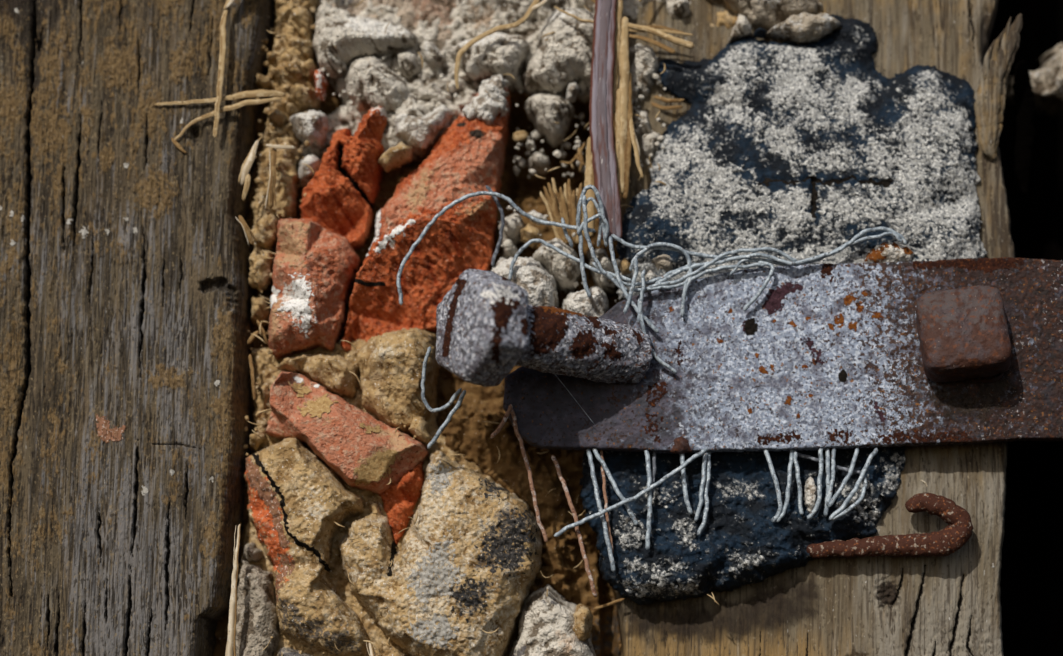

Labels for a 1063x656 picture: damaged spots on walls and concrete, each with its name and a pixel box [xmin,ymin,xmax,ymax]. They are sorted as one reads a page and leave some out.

crack [76,0,84,65]
crack [62,101,103,303]
crack [8,0,44,597]
rust [488,295,645,363]
rust [789,317,824,370]
rust [821,263,834,283]
rust [913,257,1024,275]
rust [757,396,801,446]
rust [826,427,853,444]
crack [891,565,974,656]